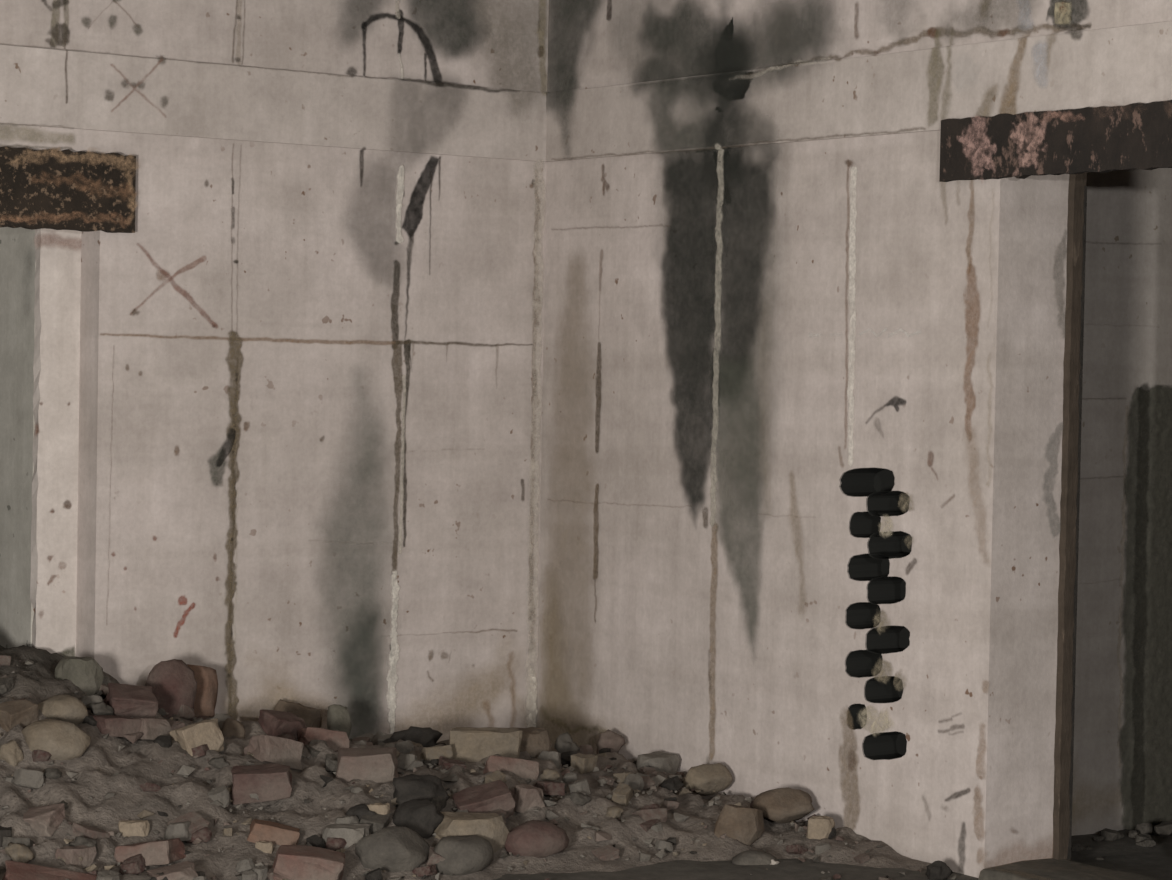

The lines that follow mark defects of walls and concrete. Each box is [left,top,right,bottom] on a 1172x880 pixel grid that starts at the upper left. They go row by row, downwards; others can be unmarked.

crack [735,24,1083,78]
leakage [663,157,768,511]
corrosion [965,299,979,436]